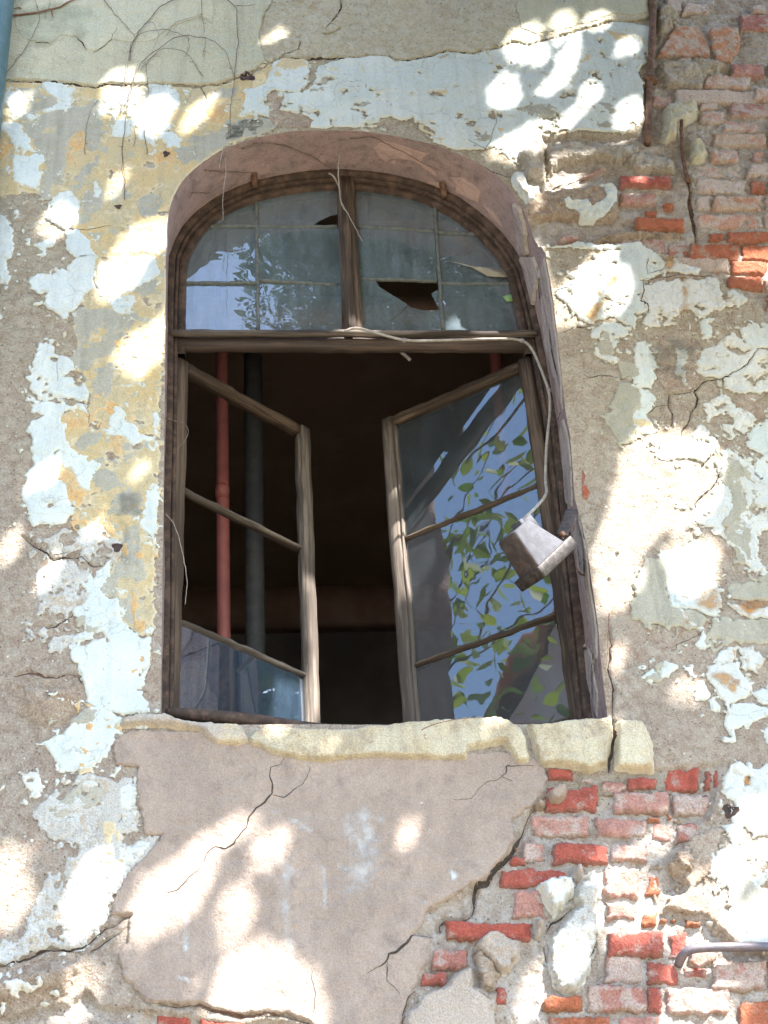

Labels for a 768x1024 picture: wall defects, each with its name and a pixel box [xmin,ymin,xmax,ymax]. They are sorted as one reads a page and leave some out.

crack [6,79,144,89]
peeling [0,202,26,290]
peeling [546,0,768,602]
crack [646,348,760,434]
crack [583,631,617,773]
peeling [630,537,768,746]
peeling [0,968,43,999]
peeling [18,768,46,799]
crack [3,916,131,967]
crack [167,758,310,893]
crack [368,809,535,1024]
flaking render [403,759,768,1024]